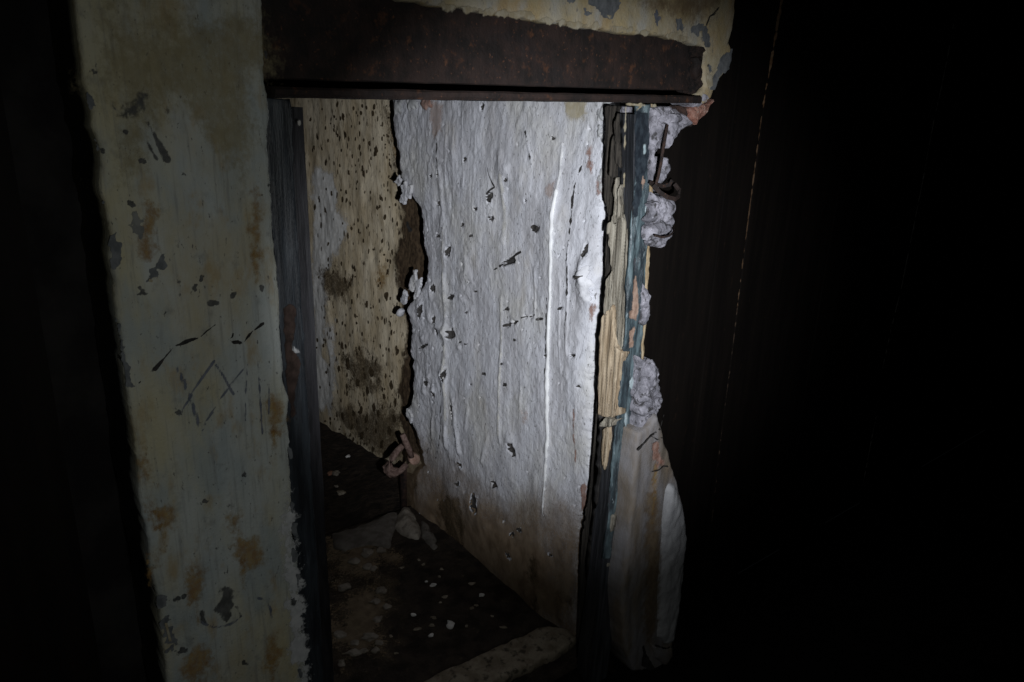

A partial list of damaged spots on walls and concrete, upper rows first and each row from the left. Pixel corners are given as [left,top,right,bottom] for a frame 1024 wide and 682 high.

flaking render [439,0,711,47]
flaking render [394,175,413,205]
flaking render [394,100,432,115]
flaking render [596,102,634,192]
flaking render [641,49,733,248]
corrosion [676,46,709,96]
water stain [311,101,405,460]
flaking render [396,269,468,349]
water stain [407,142,581,644]
flaking render [629,276,663,427]